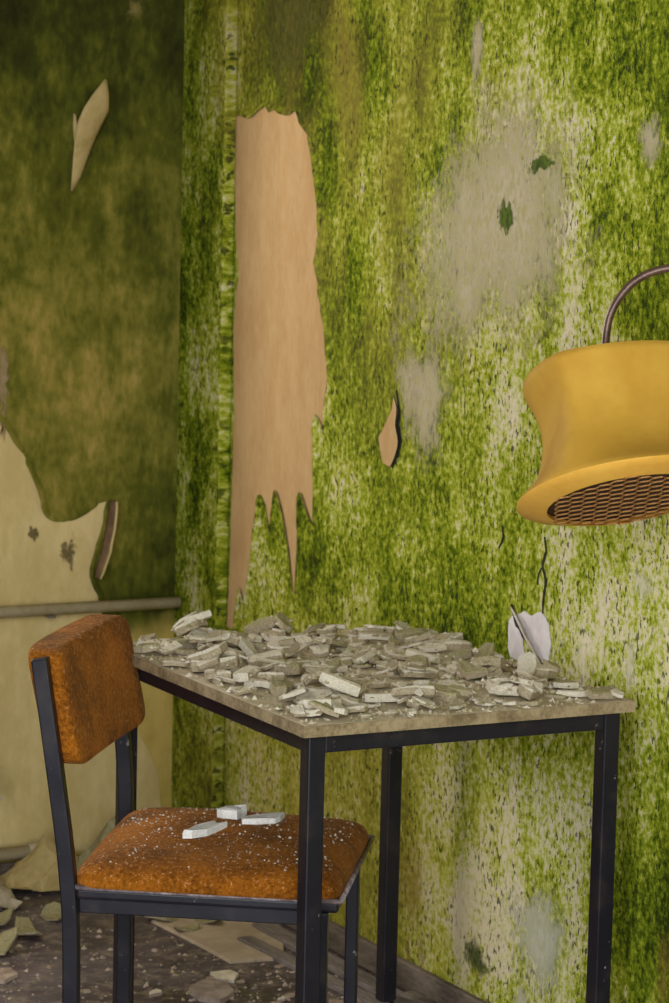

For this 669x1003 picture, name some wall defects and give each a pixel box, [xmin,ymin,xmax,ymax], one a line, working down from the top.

peeling [71,79,109,191]
leakage [641,116,659,164]
leakage [395,21,574,454]
leakage [0,349,9,436]
peeling [226,101,331,630]
peeling [378,390,402,468]
peeling [0,411,118,851]
peeling [508,604,551,664]
peeling [136,731,160,810]
leakage [465,942,486,975]